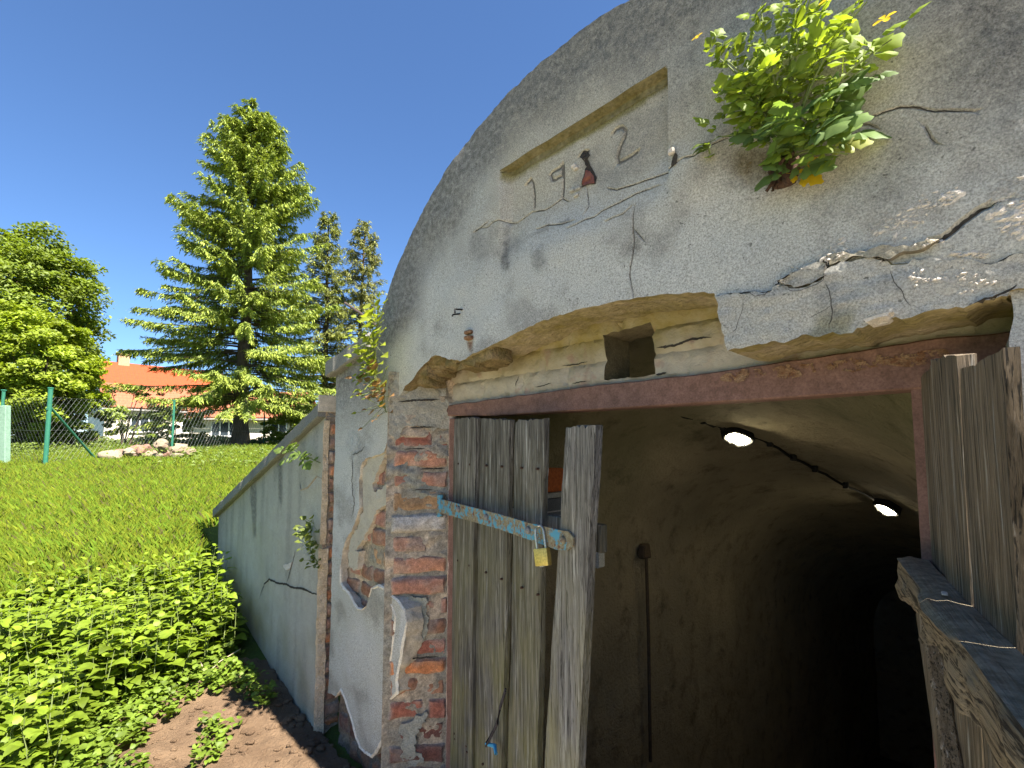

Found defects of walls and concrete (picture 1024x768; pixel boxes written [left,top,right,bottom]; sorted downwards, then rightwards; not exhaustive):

crack [865,106,972,143]
crack [474,138,727,294]
crack [939,200,1004,240]
crack [880,258,911,306]
crack [975,285,1017,304]
peeling [863,312,895,328]
flaking render [416,347,513,389]
crack [259,553,317,599]
flaking render [313,420,408,768]